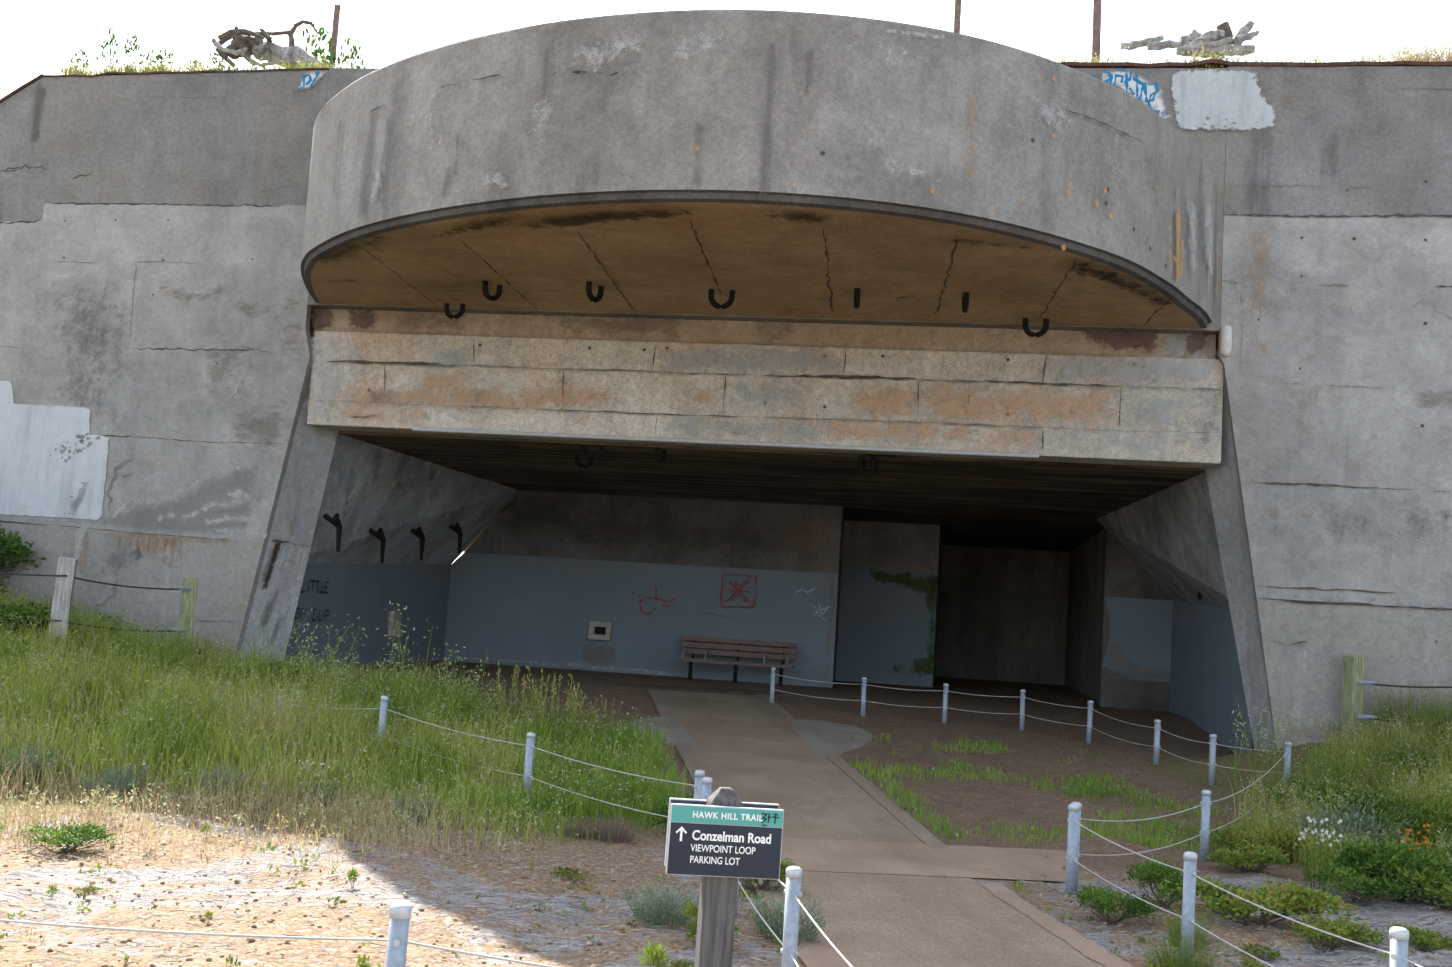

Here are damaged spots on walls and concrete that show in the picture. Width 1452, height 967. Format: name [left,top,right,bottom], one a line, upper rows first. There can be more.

water stain [112,489,307,588]